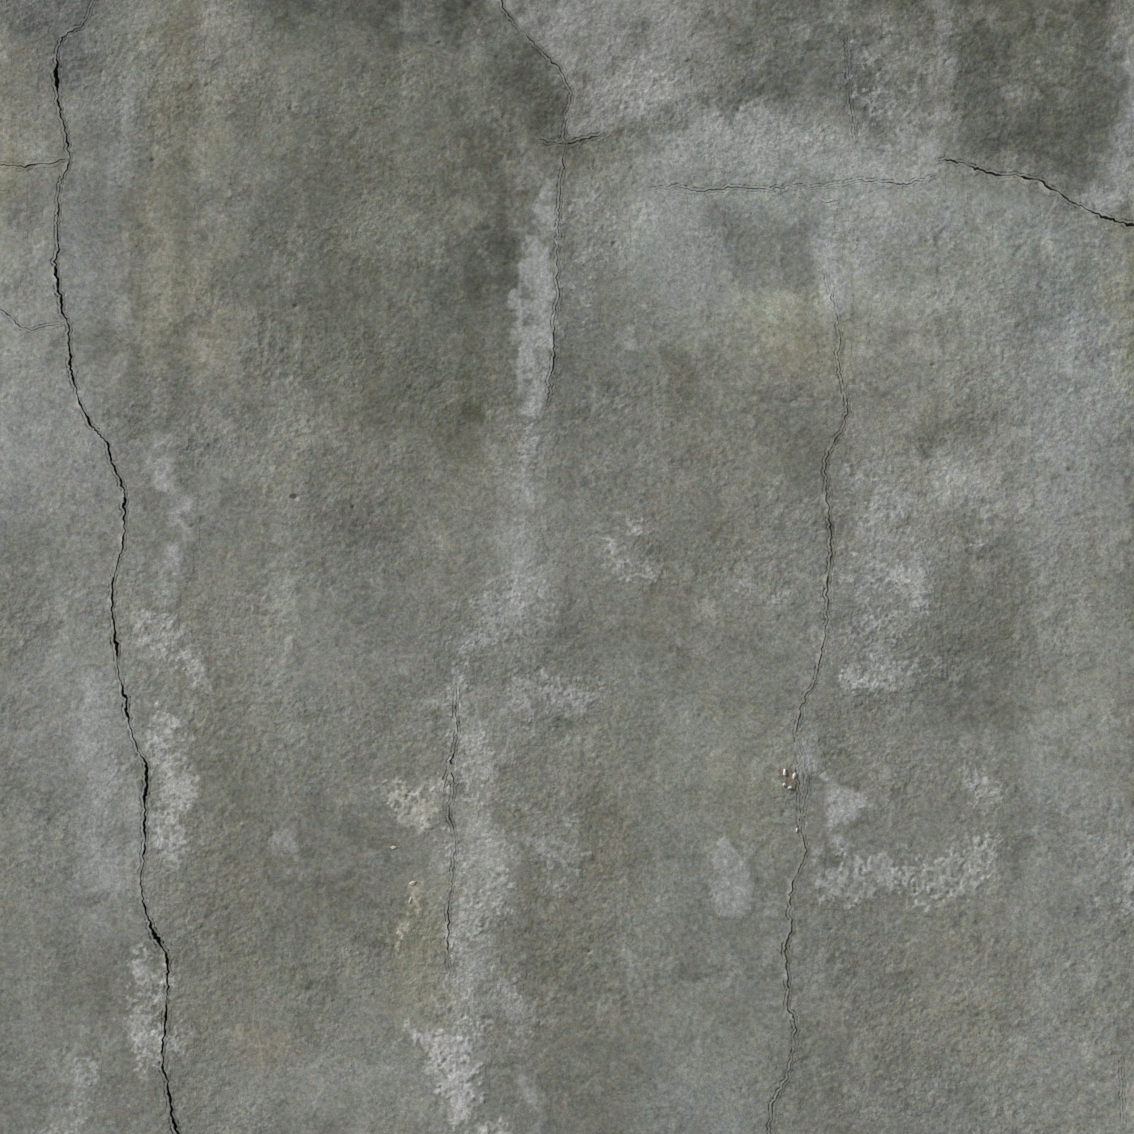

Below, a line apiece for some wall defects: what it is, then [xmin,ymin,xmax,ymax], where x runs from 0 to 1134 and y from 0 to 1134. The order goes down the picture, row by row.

leakage [246,0,566,329]
crack [494,0,606,402]
leakage [695,0,934,132]
crack [844,33,858,142]
crack [647,156,1134,229]
leakage [944,0,1131,204]
crack [0,0,182,1134]
crack [440,686,461,977]
efflorescence [360,386,620,1134]
crack [767,266,851,1134]